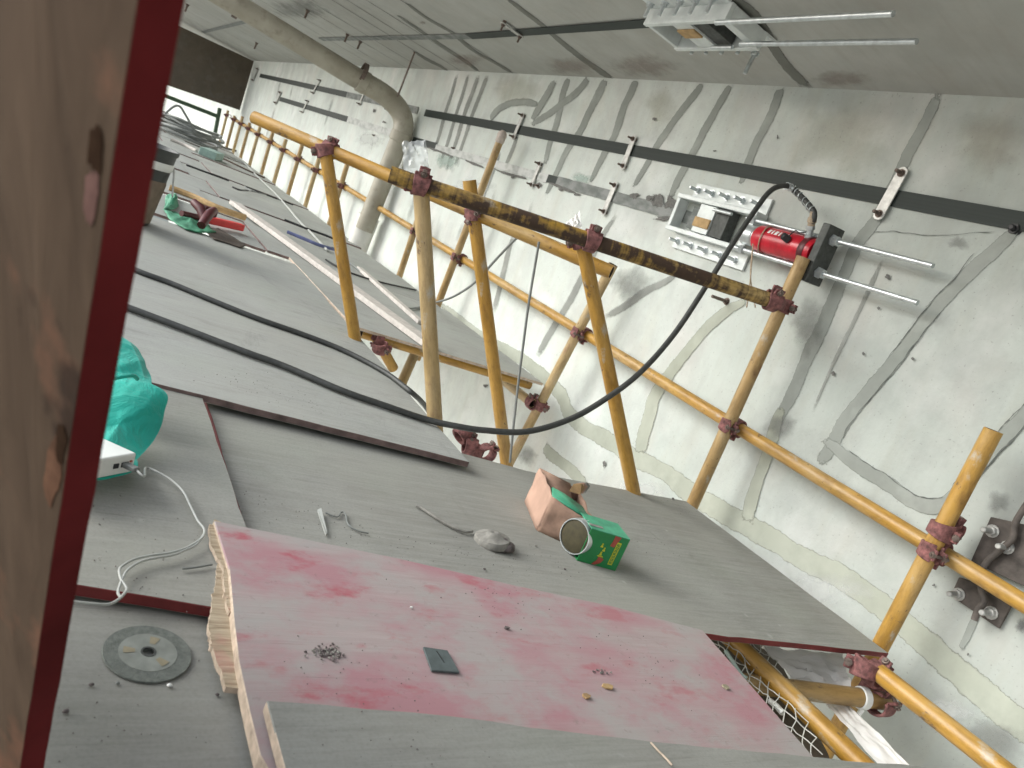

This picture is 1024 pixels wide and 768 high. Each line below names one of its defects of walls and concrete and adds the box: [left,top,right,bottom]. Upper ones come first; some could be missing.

crack [441,84,1024,743]